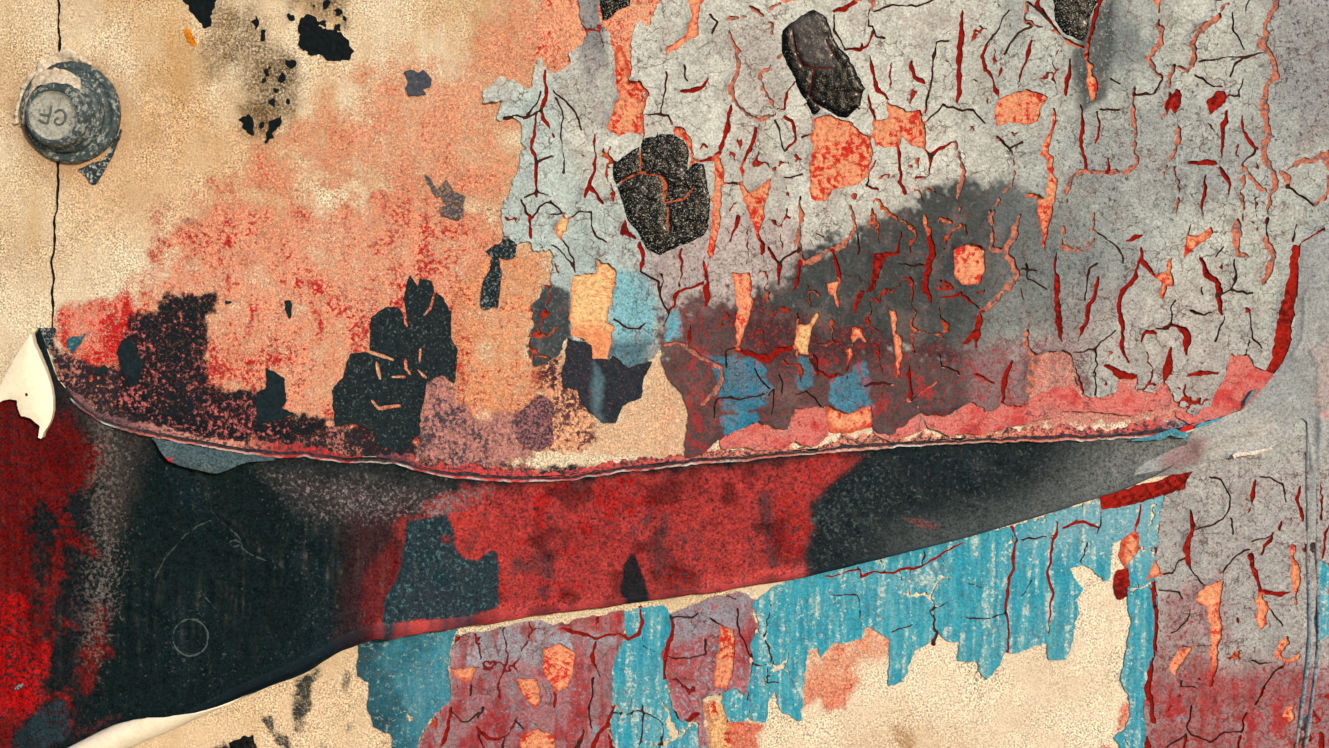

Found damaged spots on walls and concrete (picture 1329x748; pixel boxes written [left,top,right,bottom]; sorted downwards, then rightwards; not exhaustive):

crack [530,69,555,198]
crack [648,15,797,162]
crack [869,10,986,124]
crack [1019,0,1230,203]
crack [1188,0,1280,219]
crack [50,161,60,328]
peeling [332,275,458,453]
peeling [480,0,1329,461]
crack [1078,234,1192,383]
crack [1199,257,1223,315]
peeling [0,328,1329,748]
crack [561,606,675,680]